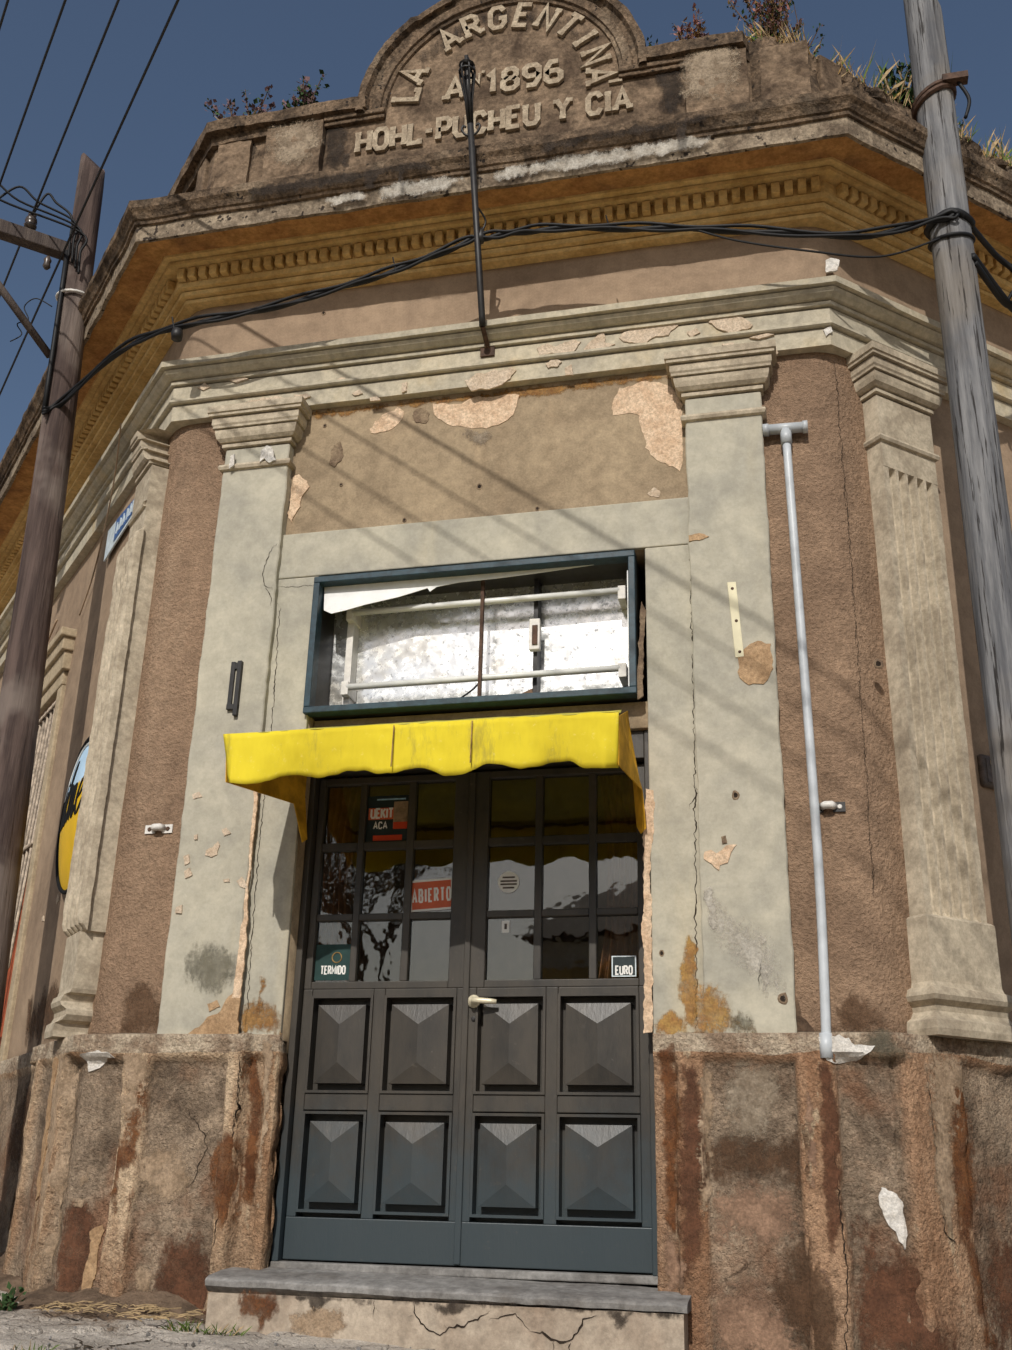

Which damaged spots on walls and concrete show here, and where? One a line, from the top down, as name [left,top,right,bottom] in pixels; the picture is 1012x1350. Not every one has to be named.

peeling [337,367,519,445]
peeling [612,381,683,471]
peeling [287,474,310,522]
leakage [25,985,59,1044]
peeling [80,1050,115,1072]
leakage [656,936,753,1034]
leakage [818,993,903,1064]
leakage [8,1084,31,1172]
leakage [209,979,281,1227]
leakage [33,1055,96,1292]
spalling [878,1187,908,1249]
crack [413,1302,594,1350]